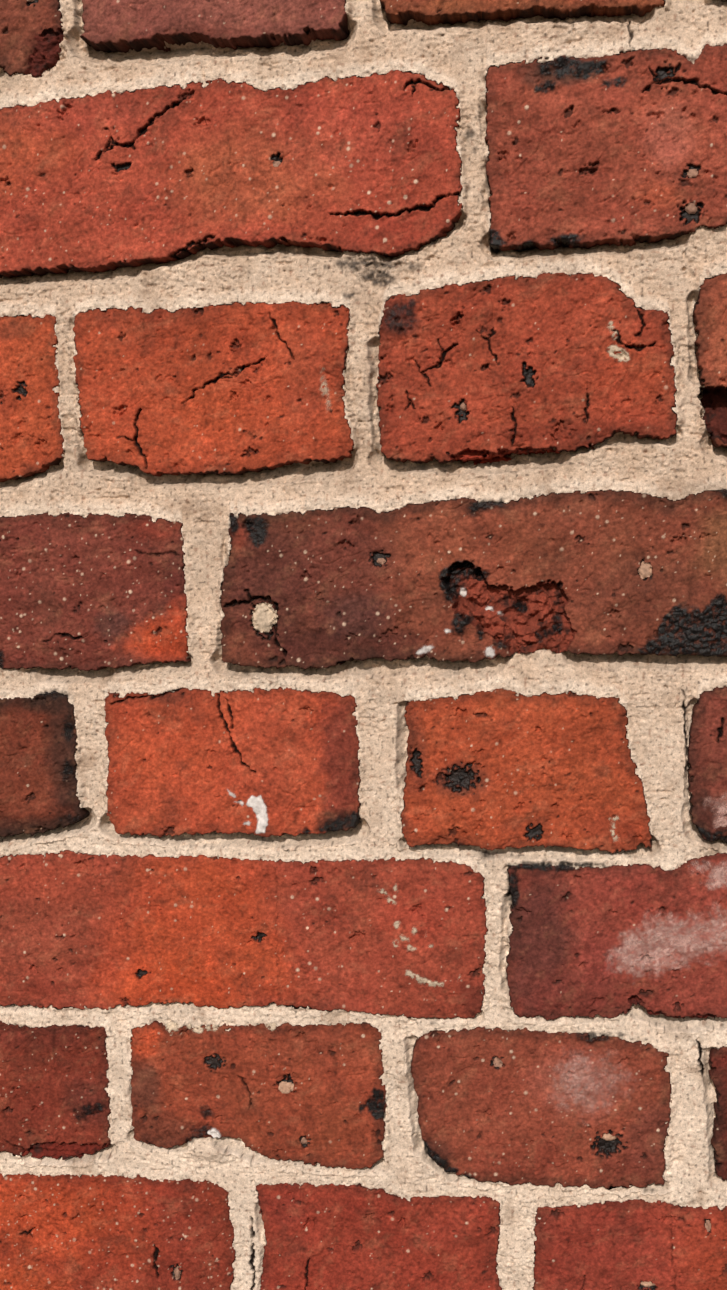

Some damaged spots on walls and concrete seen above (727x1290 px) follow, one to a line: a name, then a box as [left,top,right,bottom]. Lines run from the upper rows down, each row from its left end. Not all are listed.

crack [97,97,187,160]
crack [331,193,460,220]
crack [190,319,294,398]
crack [125,409,148,467]
spalling [442,560,577,654]
crack [217,694,256,772]